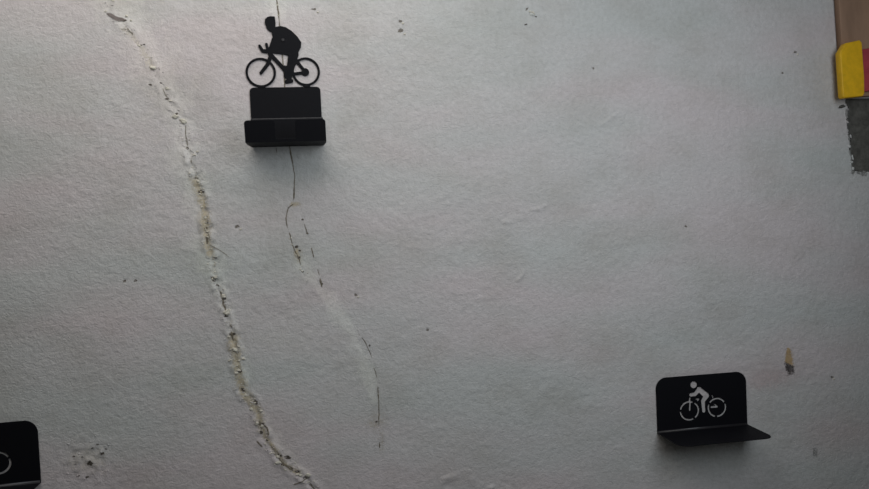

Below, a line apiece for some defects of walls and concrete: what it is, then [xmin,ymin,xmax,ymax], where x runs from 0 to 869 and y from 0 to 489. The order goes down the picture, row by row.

crack [73,0,318,489]
crack [276,146,381,448]